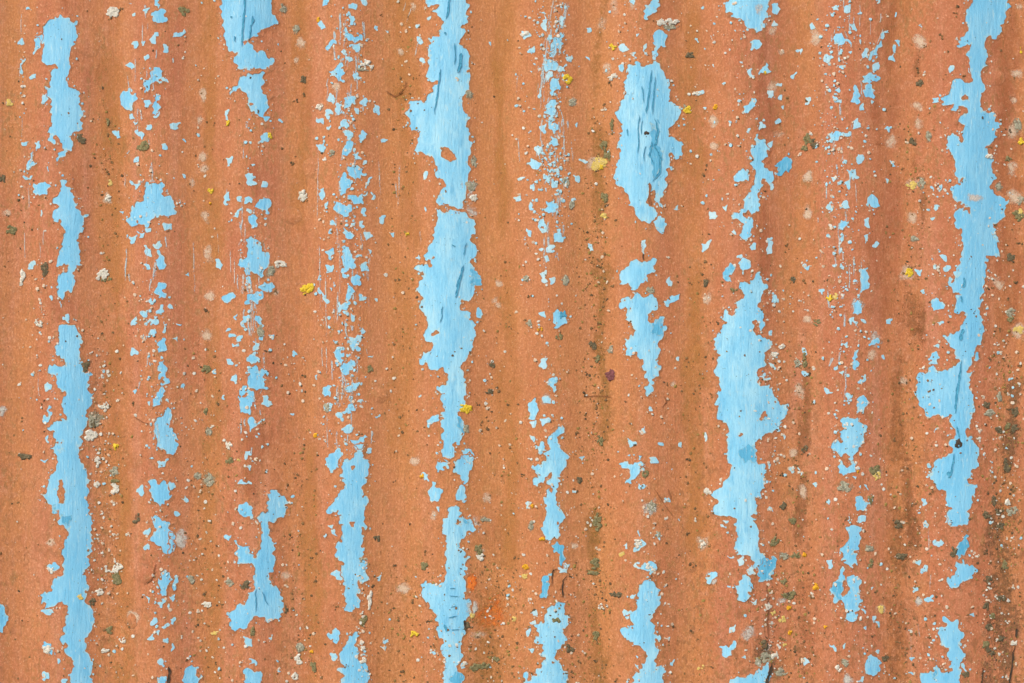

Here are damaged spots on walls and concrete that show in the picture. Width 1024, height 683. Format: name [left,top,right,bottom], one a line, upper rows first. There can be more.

peeling [17,12,99,683]
peeling [120,174,203,683]
peeling [213,0,283,438]
peeling [224,451,295,683]
peeling [314,0,388,683]
peeling [401,0,488,683]
corrosion [467,575,477,590]
peeling [517,358,584,683]
peeling [609,0,688,411]
peeling [703,0,797,605]
peeling [824,154,885,630]
peeling [911,0,1014,591]